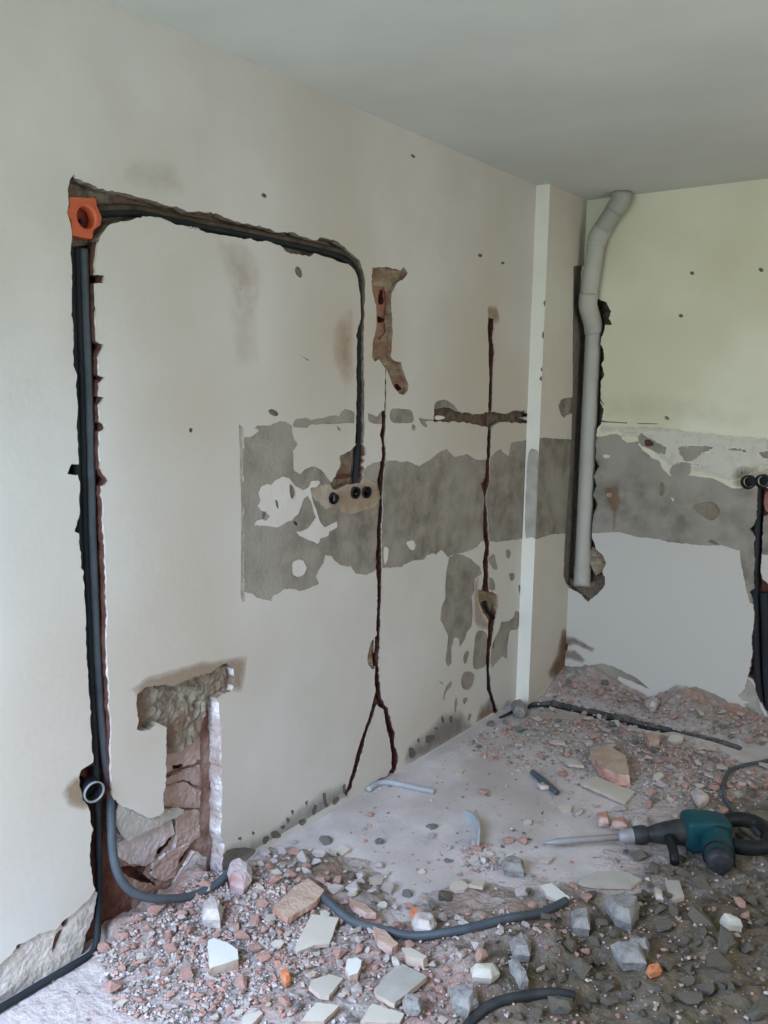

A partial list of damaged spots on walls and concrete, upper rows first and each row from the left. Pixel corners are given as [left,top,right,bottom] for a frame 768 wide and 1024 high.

flaking render [371,267,408,395]
flaking render [368,400,459,431]
flaking render [558,397,572,418]
flaking render [592,433,768,603]
flaking render [239,409,571,758]
spalling [105,663,347,909]
flaking render [0,891,98,1003]